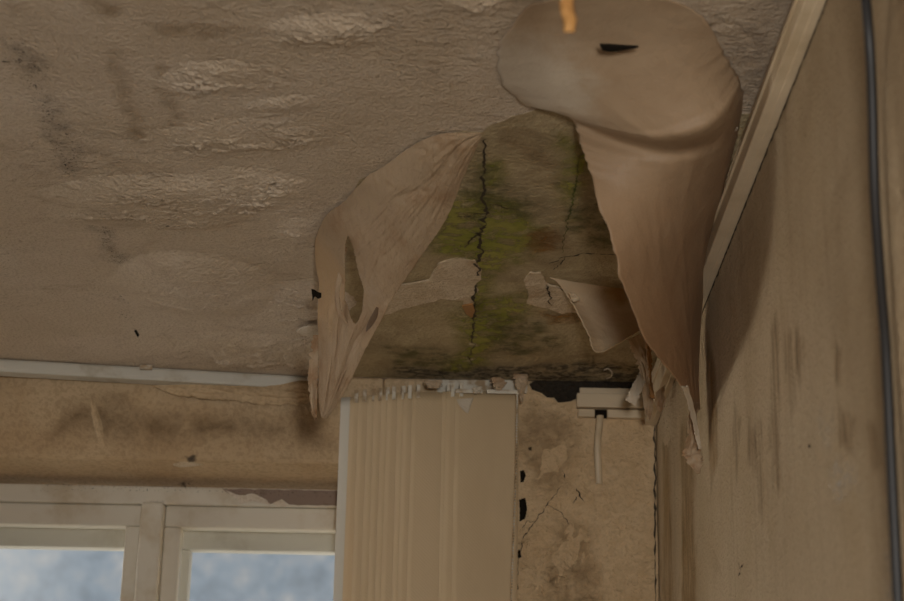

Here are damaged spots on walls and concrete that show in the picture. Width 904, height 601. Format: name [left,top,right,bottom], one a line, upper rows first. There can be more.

crack [458,139,518,368]
water stain [401,362,639,382]
peeling [307,0,750,601]
crack [518,470,584,574]